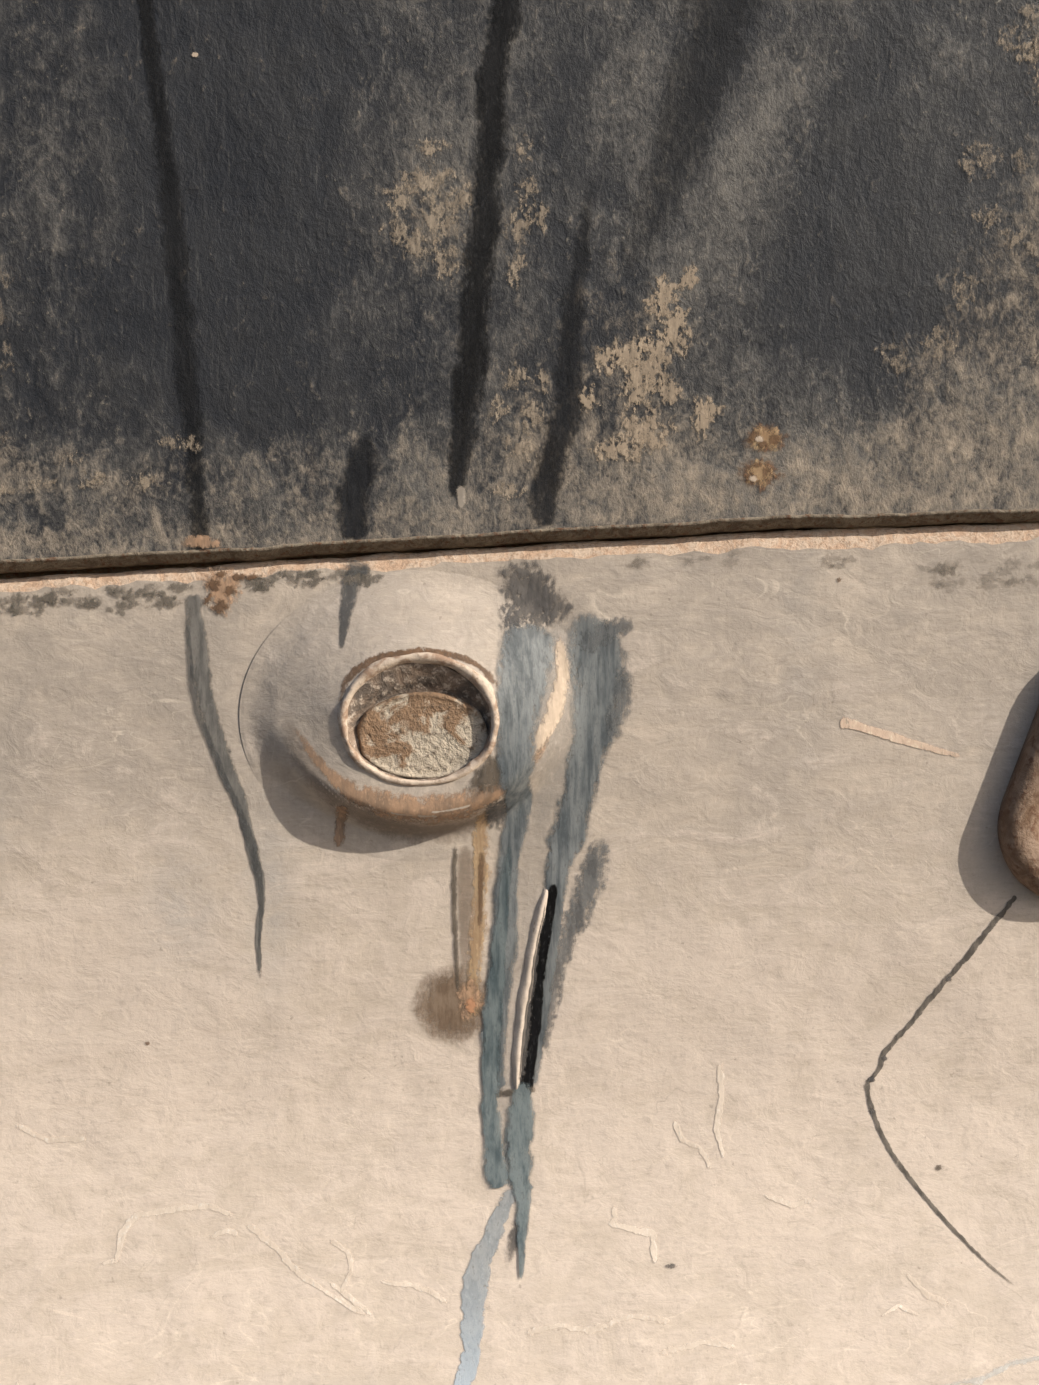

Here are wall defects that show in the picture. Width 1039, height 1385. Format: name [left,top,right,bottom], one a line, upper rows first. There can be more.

water stain [138,0,181,215]
water stain [186,595,266,973]
water stain [339,560,369,647]
water stain [337,436,377,539]
rust [304,743,505,1038]
rust [341,647,497,696]
water stain [449,0,523,508]
crack [511,884,557,1094]
water stain [454,561,633,1385]
water stain [530,250,590,525]
rust [743,423,787,492]
crack [865,896,1017,1281]